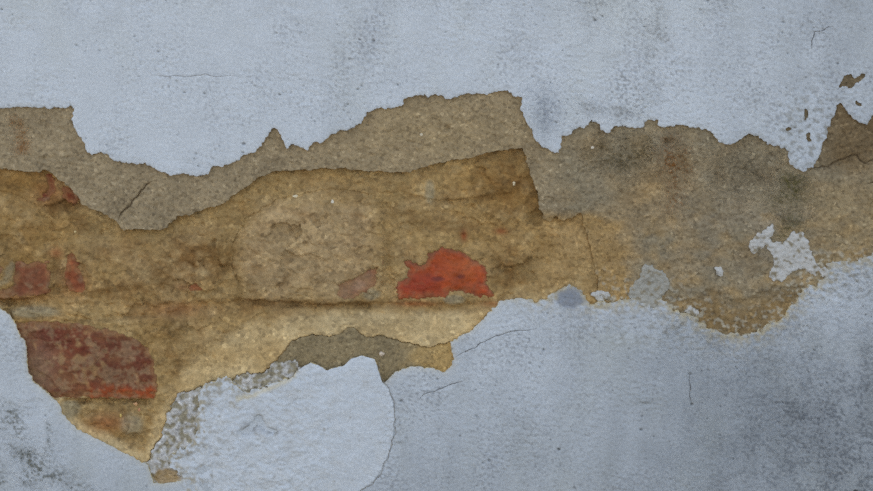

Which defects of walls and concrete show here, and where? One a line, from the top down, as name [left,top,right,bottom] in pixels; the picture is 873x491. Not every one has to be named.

spalling [839,74,865,88]
spalling [0,148,599,483]
crack [360,363,396,491]
spalling [0,90,873,336]